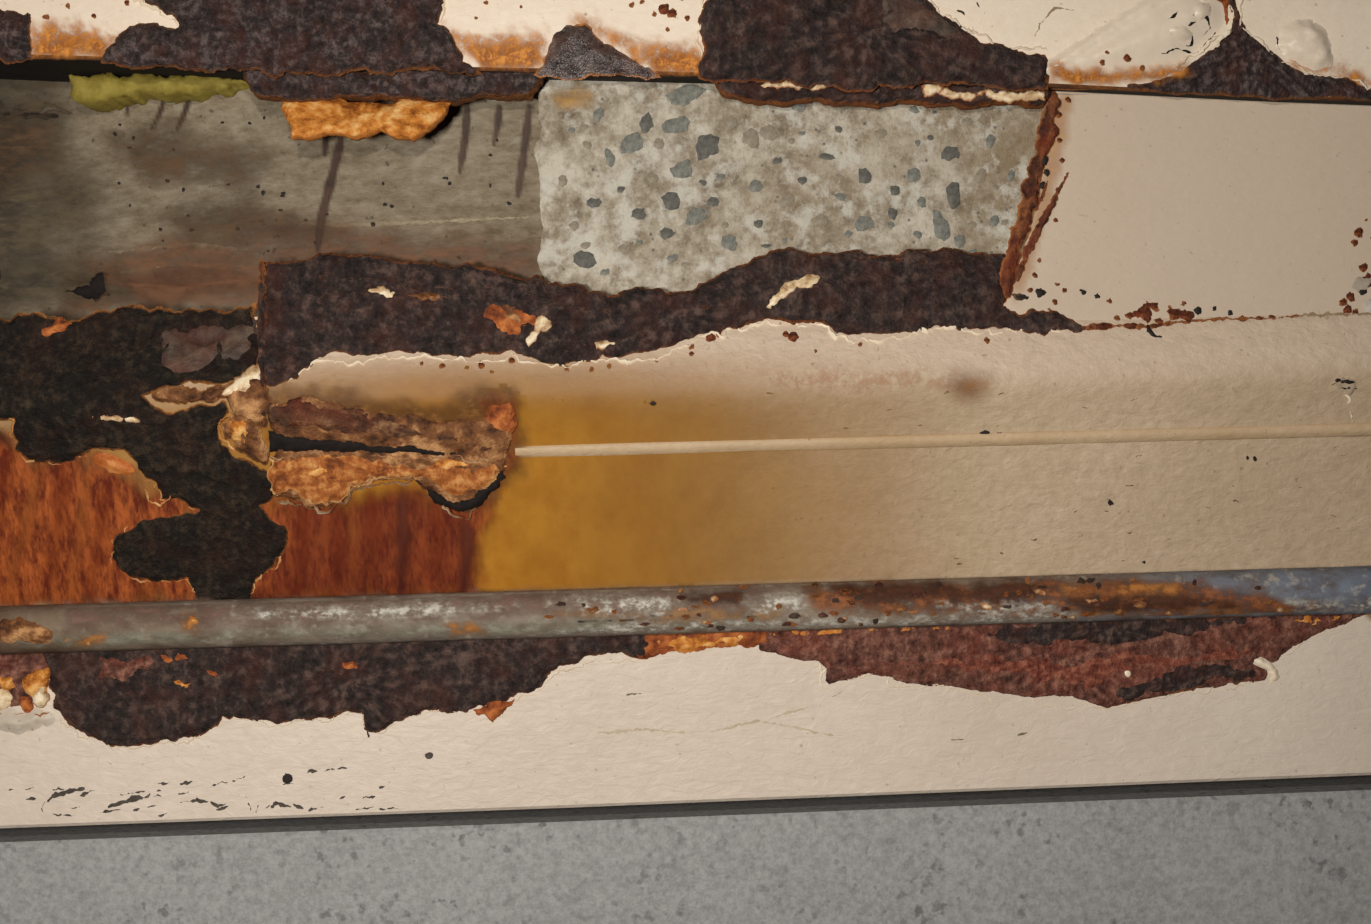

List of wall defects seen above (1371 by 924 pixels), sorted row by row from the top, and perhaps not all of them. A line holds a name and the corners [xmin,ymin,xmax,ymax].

rust [1052,63,1186,84]
peeling [1053,0,1371,101]
spalling [534,80,1044,296]
rust [1351,218,1371,247]
rust [0,0,1086,624]
rust [1339,262,1371,314]
peeling [221,364,261,397]
peeling [229,420,248,443]
peeling [266,389,522,520]
rust [0,616,53,644]
peeling [0,653,50,718]
rust [43,577,1371,751]